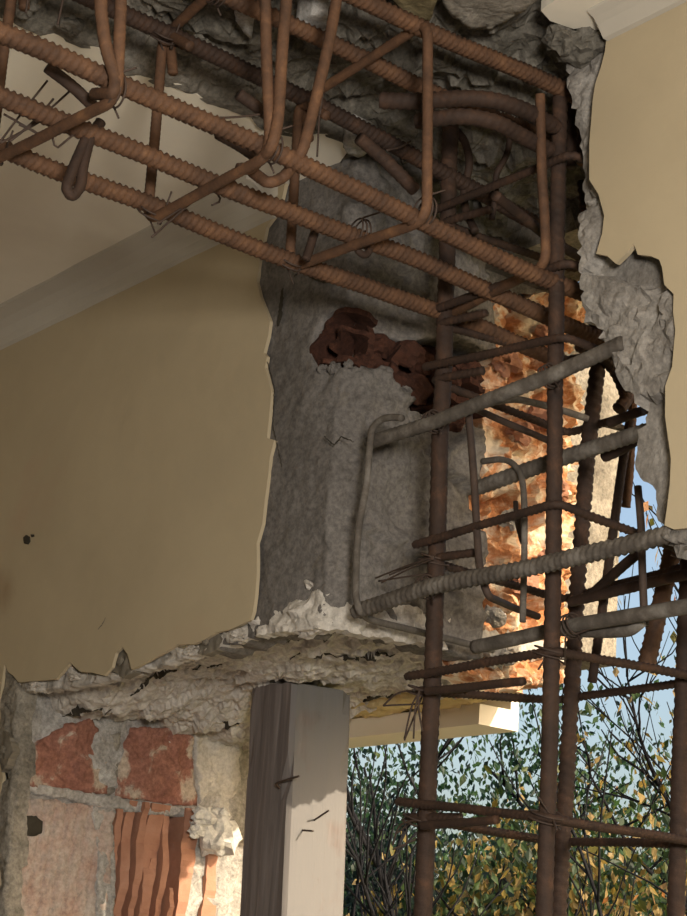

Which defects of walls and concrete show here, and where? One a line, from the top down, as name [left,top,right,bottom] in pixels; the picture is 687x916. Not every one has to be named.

spalling [13,0,99,49]
spalling [127,0,261,68]
spalling [124,25,264,130]
spalling [286,34,321,91]
spalling [291,0,331,31]
spalling [323,54,422,152]
spalling [336,1,423,77]
spalling [313,117,441,220]
spalling [267,217,438,302]
spalling [350,0,687,665]
spalling [0,260,436,916]
spalling [587,662,600,683]